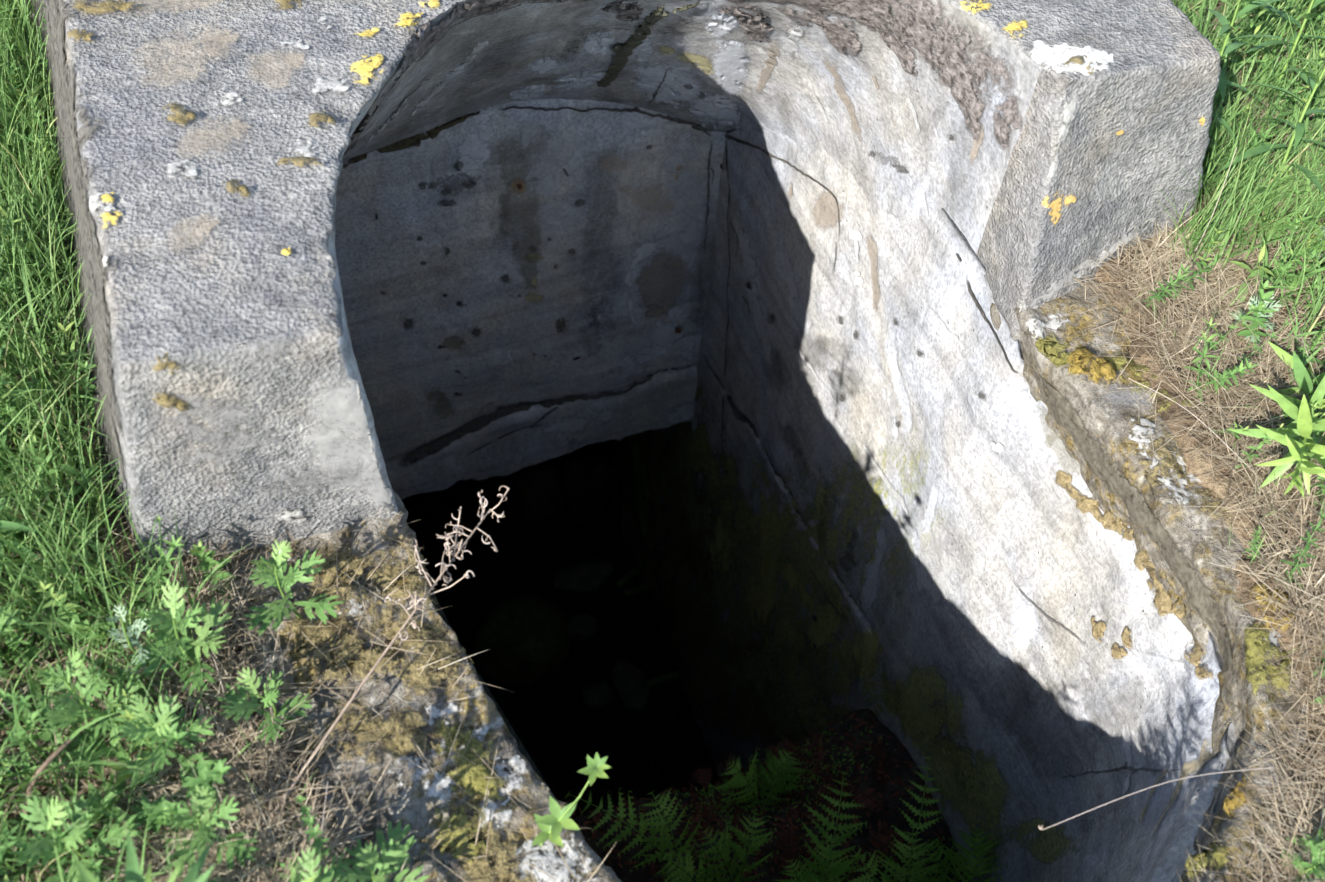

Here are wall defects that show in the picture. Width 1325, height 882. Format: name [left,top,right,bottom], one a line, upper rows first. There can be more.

crack [956,253,1017,373]
crack [402,143,862,620]
damp [851,526,887,612]
crack [1063,762,1181,778]